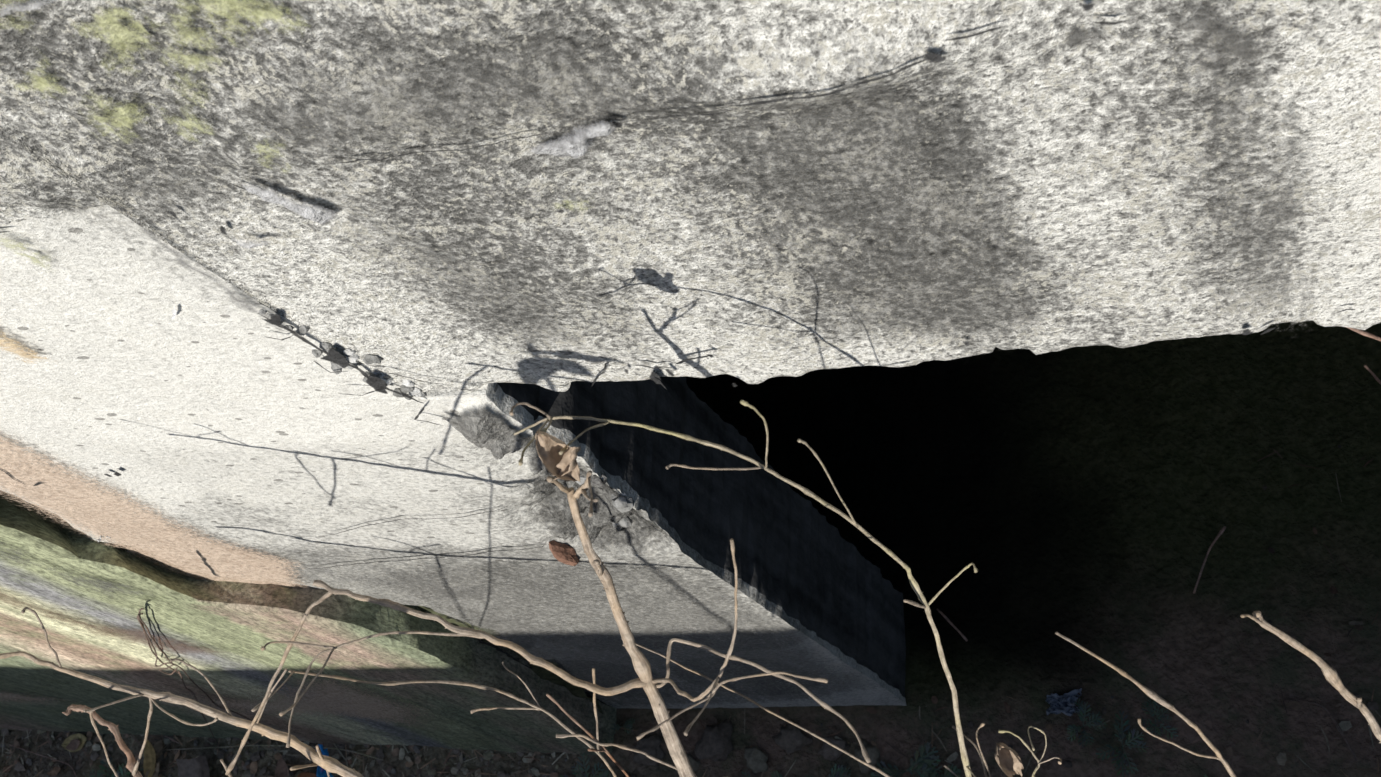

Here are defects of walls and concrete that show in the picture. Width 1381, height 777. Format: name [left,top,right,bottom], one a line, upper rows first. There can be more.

water stain [1067,31,1102,48]
crack [258,309,467,426]
crack [592,355,713,389]
spalling [442,409,667,555]